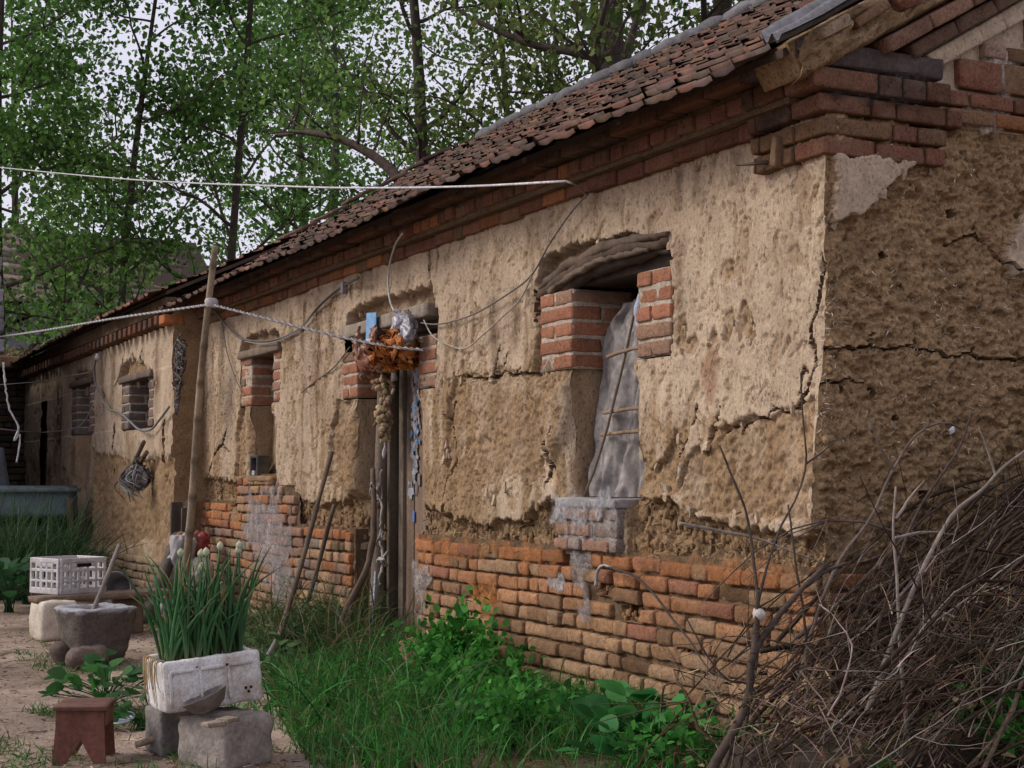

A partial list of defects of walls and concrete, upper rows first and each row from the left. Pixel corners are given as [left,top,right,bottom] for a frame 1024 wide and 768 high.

peeling [826,153,916,231]
crack [942,226,1024,271]
peeling [1000,213,1024,279]
crack [679,252,1024,458]
crack [208,428,230,475]